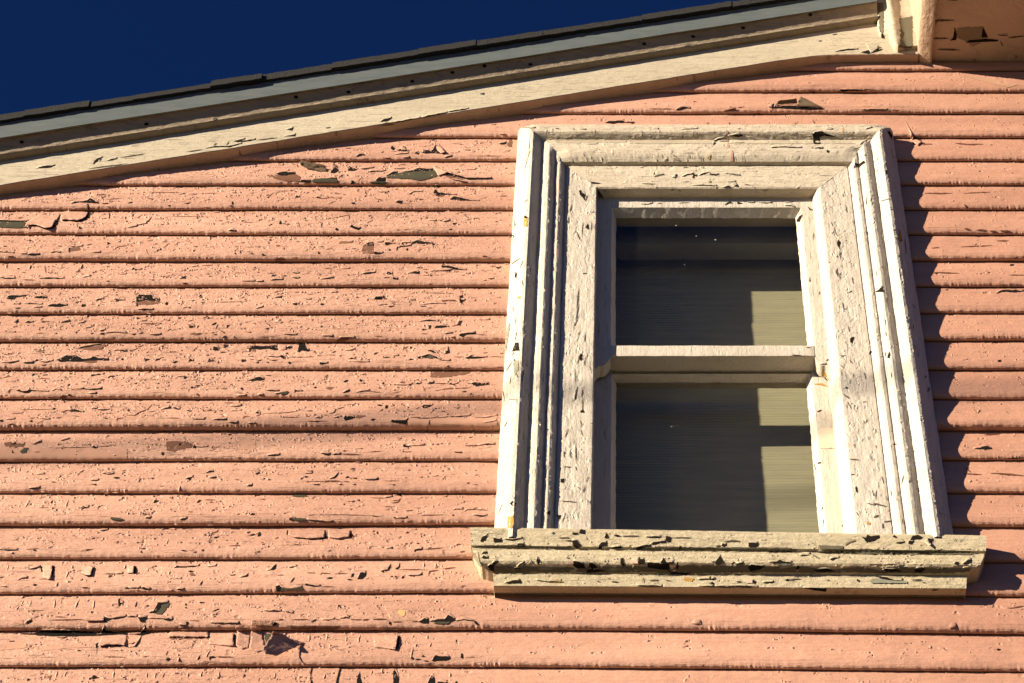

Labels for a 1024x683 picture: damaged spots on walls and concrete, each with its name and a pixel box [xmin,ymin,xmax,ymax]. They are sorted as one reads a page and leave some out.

peeling [768,96,824,109]
peeling [269,124,519,208]
peeling [654,171,741,188]
peeling [0,187,107,240]
peeling [81,264,168,321]
peeling [0,318,163,453]
peeling [161,432,209,461]
peeling [287,516,353,539]
peeling [637,534,855,589]
peeling [857,568,907,583]
peeling [890,535,942,553]
peeling [8,549,350,660]